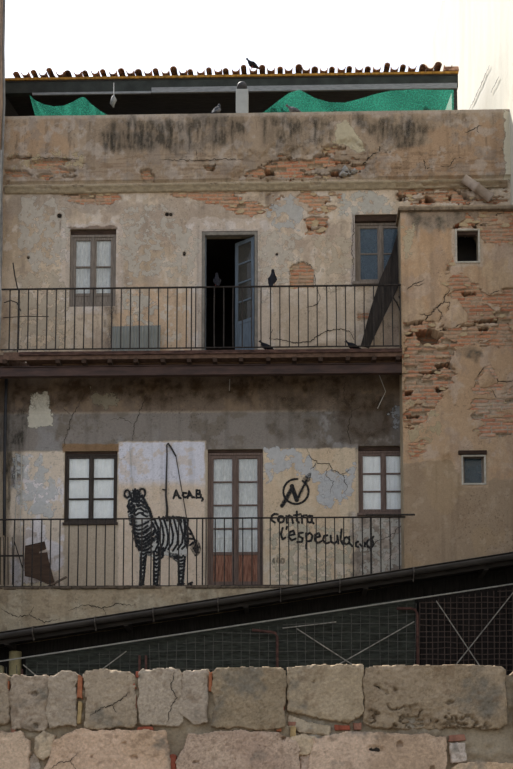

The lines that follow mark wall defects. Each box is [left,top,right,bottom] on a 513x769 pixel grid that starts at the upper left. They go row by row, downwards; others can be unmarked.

leakage [103,119,207,149]
spalling [244,120,365,182]
peeling [16,193,121,352]
peeling [170,188,513,303]
spalling [387,260,513,430]
peeling [27,391,53,429]
peeling [263,446,356,509]
crack [307,450,351,493]